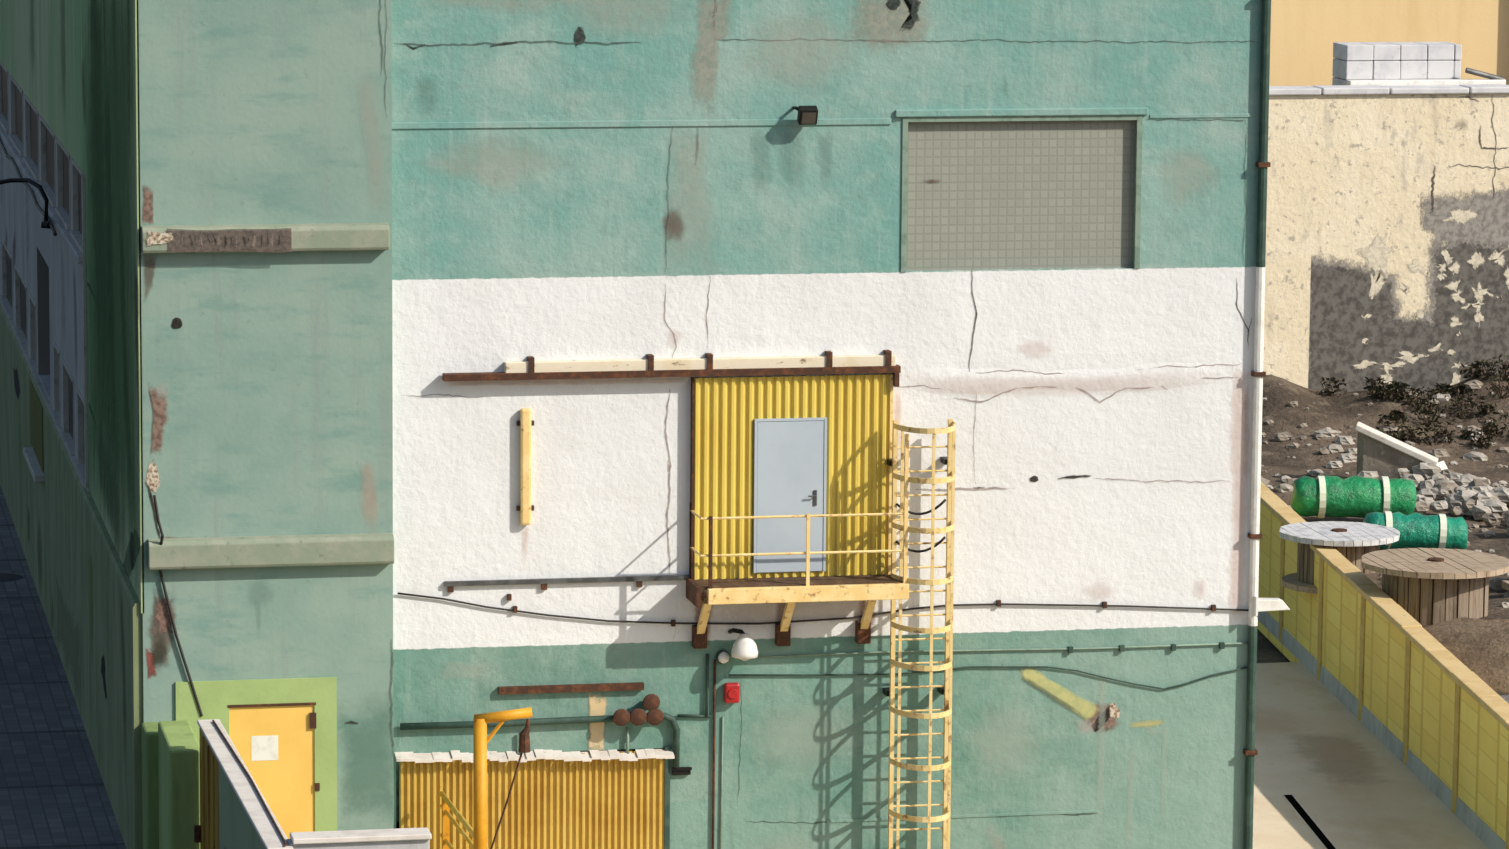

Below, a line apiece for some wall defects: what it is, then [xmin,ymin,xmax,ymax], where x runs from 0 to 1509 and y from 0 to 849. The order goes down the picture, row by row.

crack [379,0,641,109]
peeling [886,0,920,31]
crack [1430,95,1509,213]
water stain [86,0,135,521]
peeling [143,187,292,253]
crack [664,132,711,357]
crack [903,118,1252,491]
peeling [1308,189,1509,395]
peeling [146,389,167,493]
crack [664,394,672,573]
spalling [146,597,174,677]